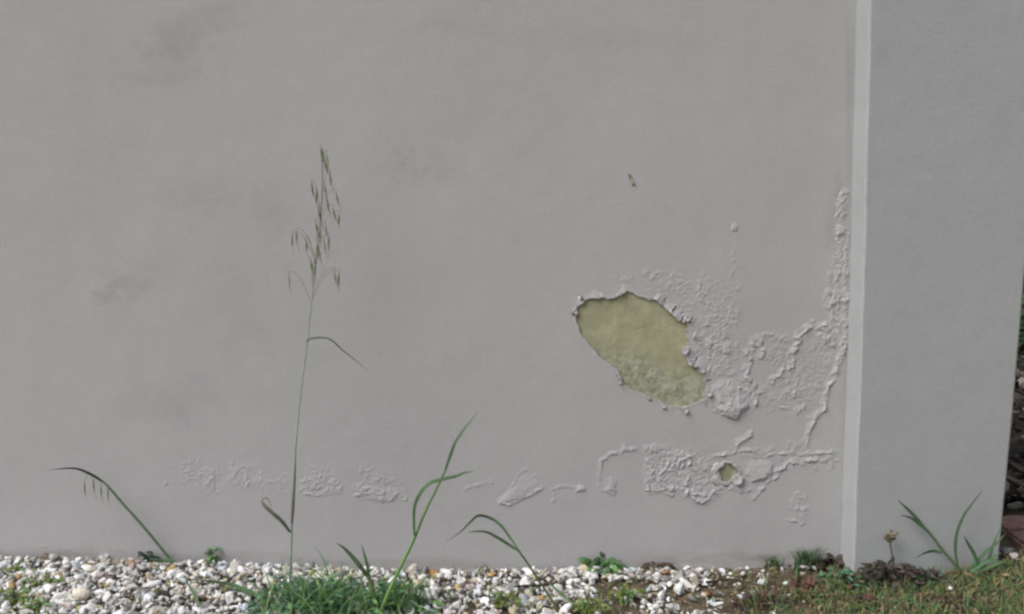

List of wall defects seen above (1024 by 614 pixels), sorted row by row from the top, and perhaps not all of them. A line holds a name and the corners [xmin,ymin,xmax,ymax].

peeling [572,284,714,415]
peeling [641,440,744,506]